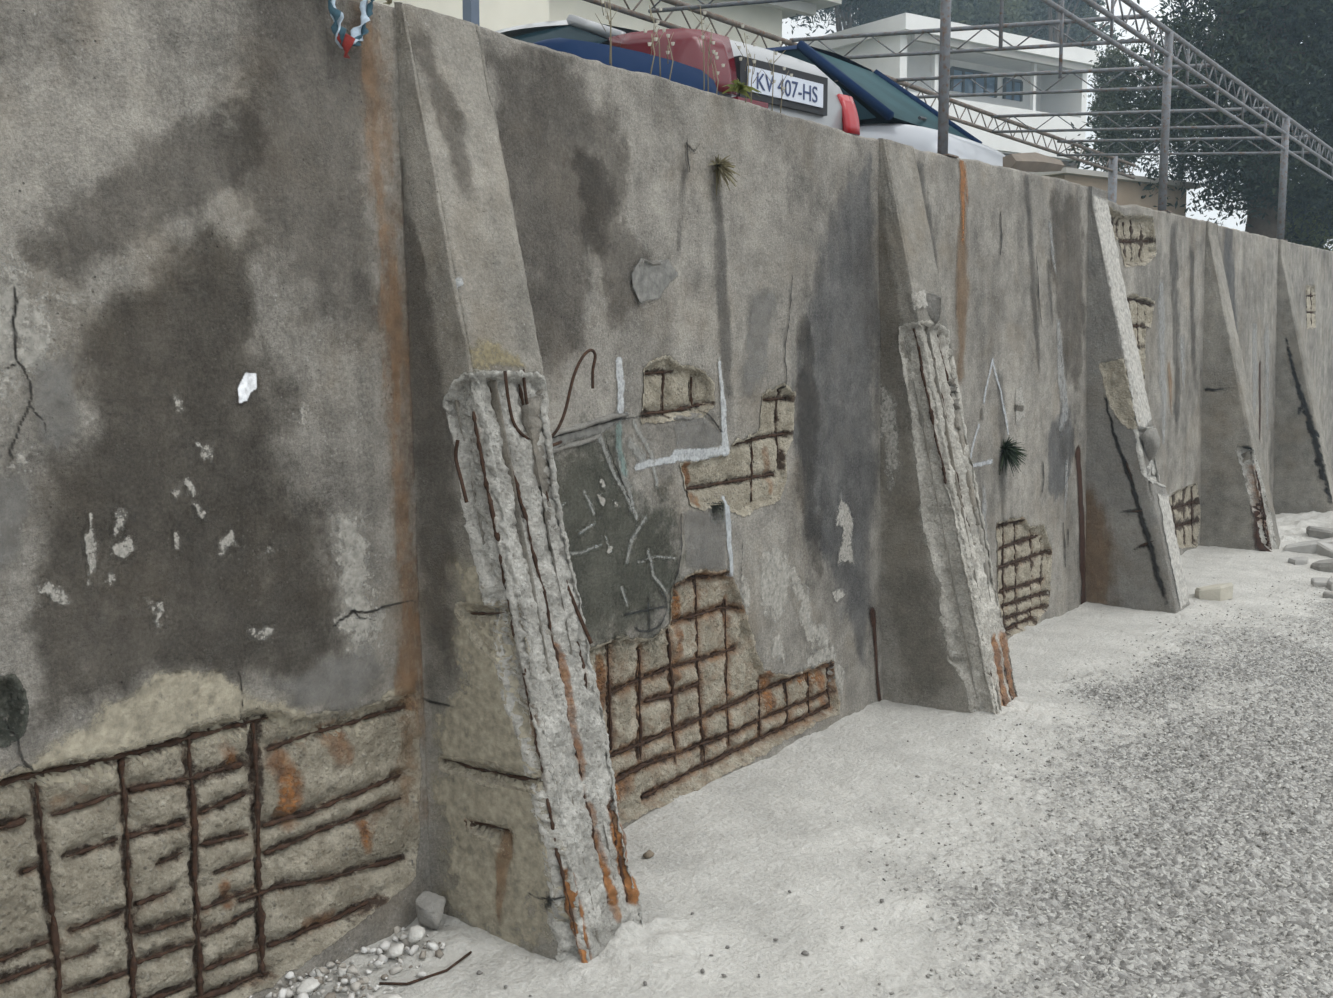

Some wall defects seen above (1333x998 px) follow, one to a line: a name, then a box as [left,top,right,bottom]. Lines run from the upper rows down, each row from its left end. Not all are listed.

corrosion [956,160,969,379]
crack [6,287,46,459]
water stain [85,513,97,583]
water stain [332,513,381,659]
spalling [0,348,845,998]
spalling [880,289,1053,715]
crack [1105,398,1168,604]
peeling [1093,196,1201,609]
crack [1286,338,1332,503]